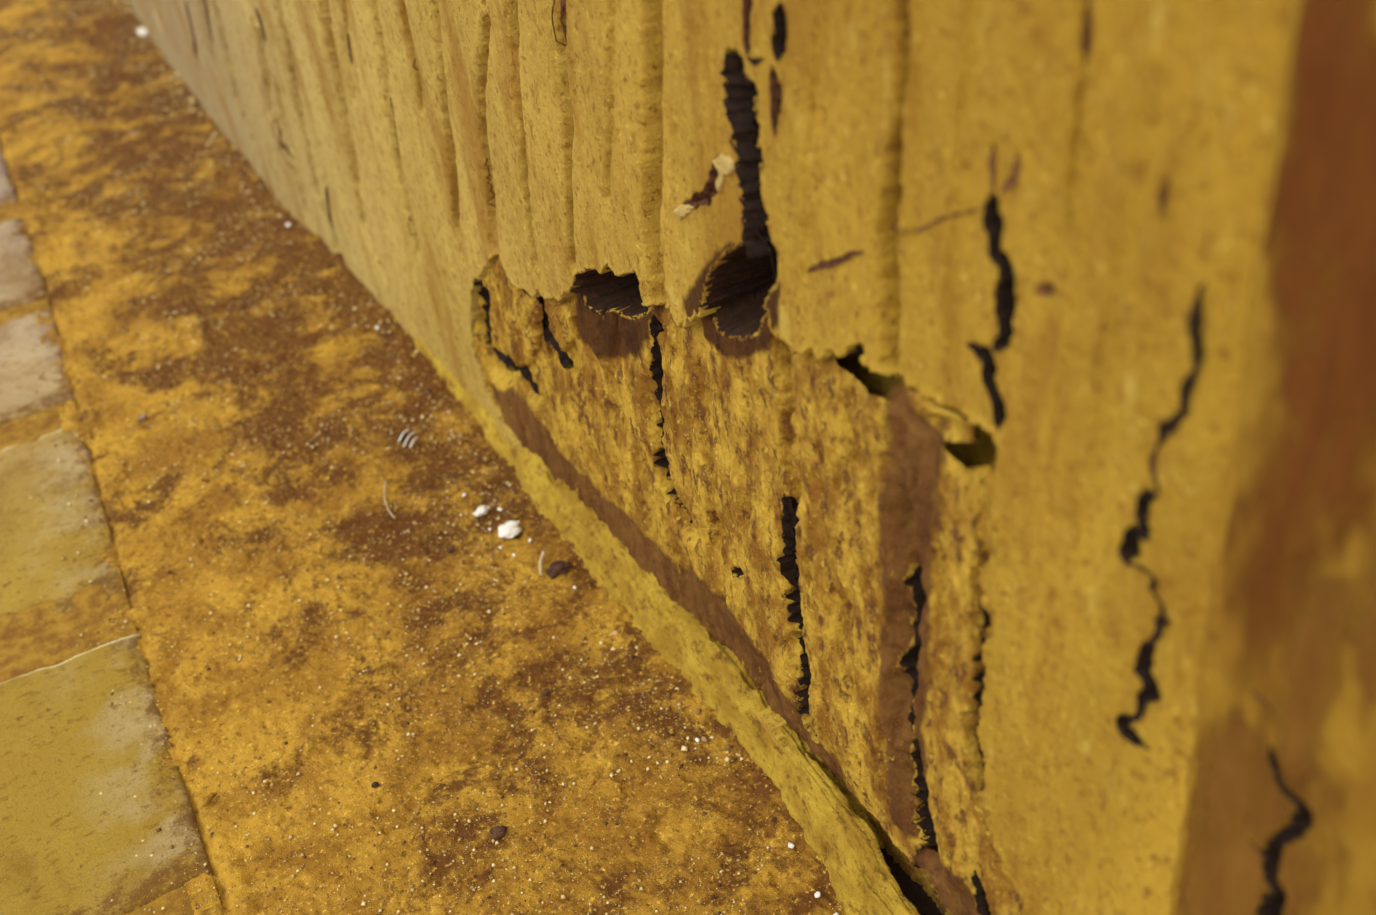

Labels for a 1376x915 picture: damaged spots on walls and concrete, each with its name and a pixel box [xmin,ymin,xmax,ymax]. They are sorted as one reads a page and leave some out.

crack [673,0,1019,430]
spalling [1036,283,1056,296]
spalling [472,229,1024,915]
crack [879,566,943,915]
crack [971,870,991,915]
crack [972,592,991,792]
crack [1115,282,1206,751]
crack [1246,688,1315,915]